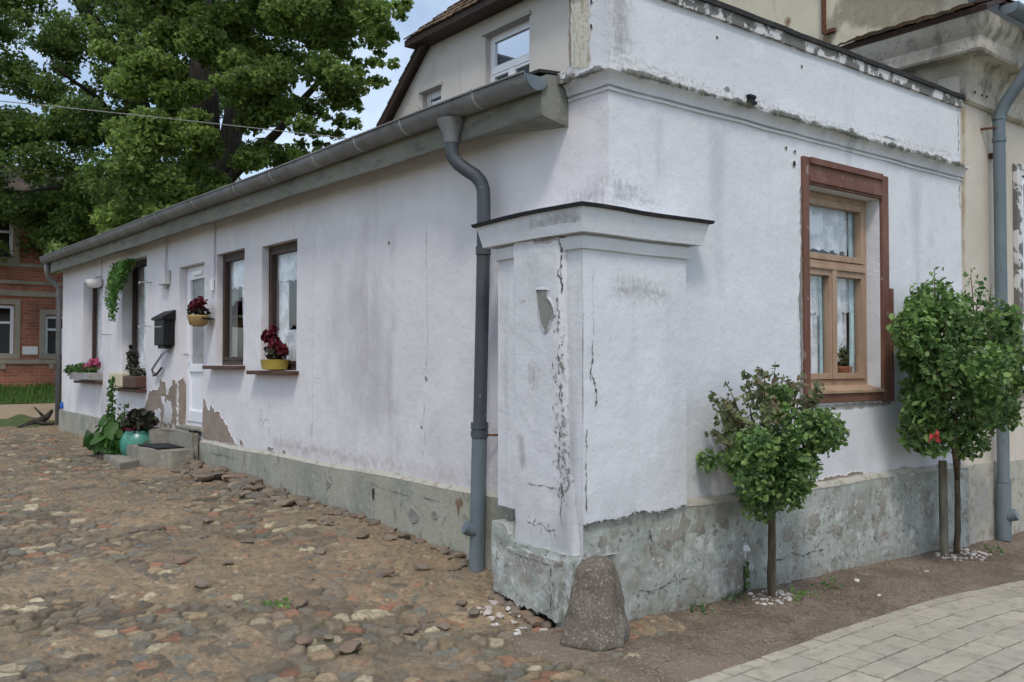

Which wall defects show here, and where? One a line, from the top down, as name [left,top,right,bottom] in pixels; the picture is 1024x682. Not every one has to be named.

spalling [144,377,186,428]
spalling [202,394,244,446]
spalling [536,287,570,509]
crack [520,241,687,556]